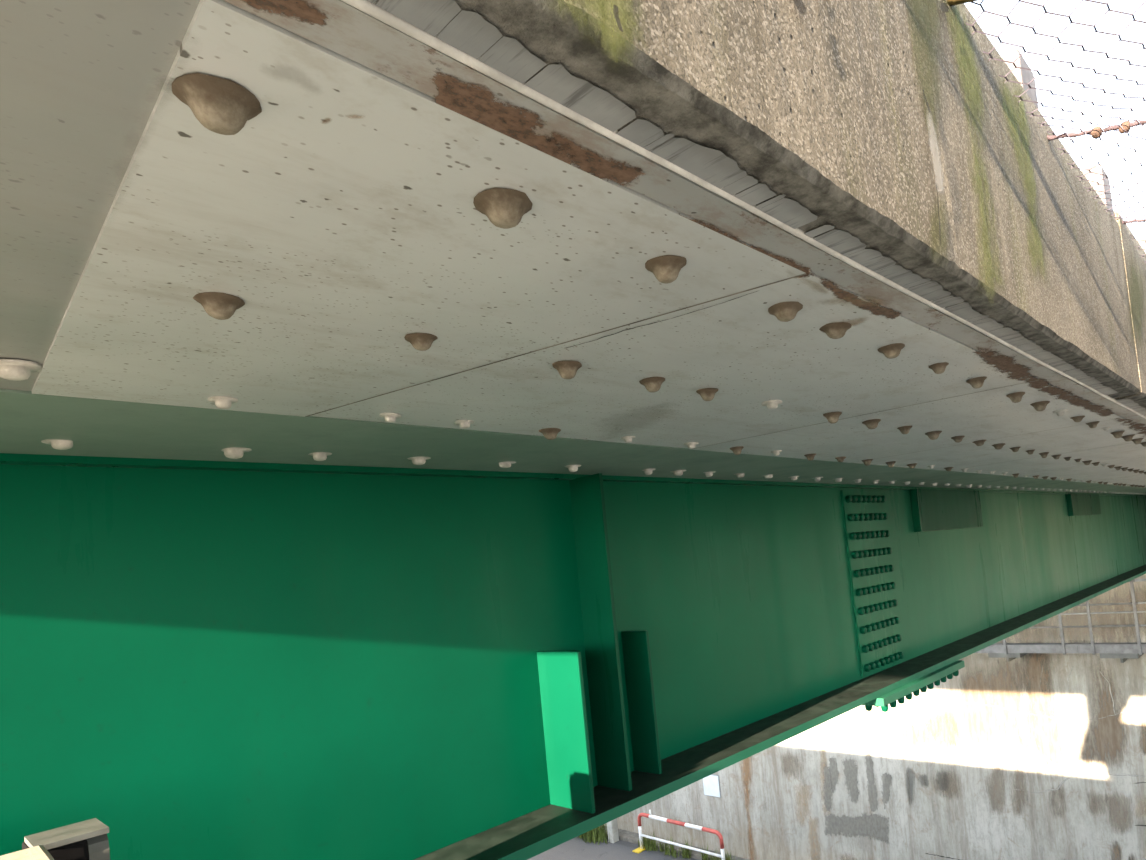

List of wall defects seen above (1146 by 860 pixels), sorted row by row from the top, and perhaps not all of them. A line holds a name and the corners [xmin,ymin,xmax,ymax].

corrosion [242,0,328,26]
corrosion [432,72,644,186]
corrosion [974,348,1146,438]
water stain [823,753,892,812]
water stain [937,774,957,797]
water stain [988,769,1024,813]